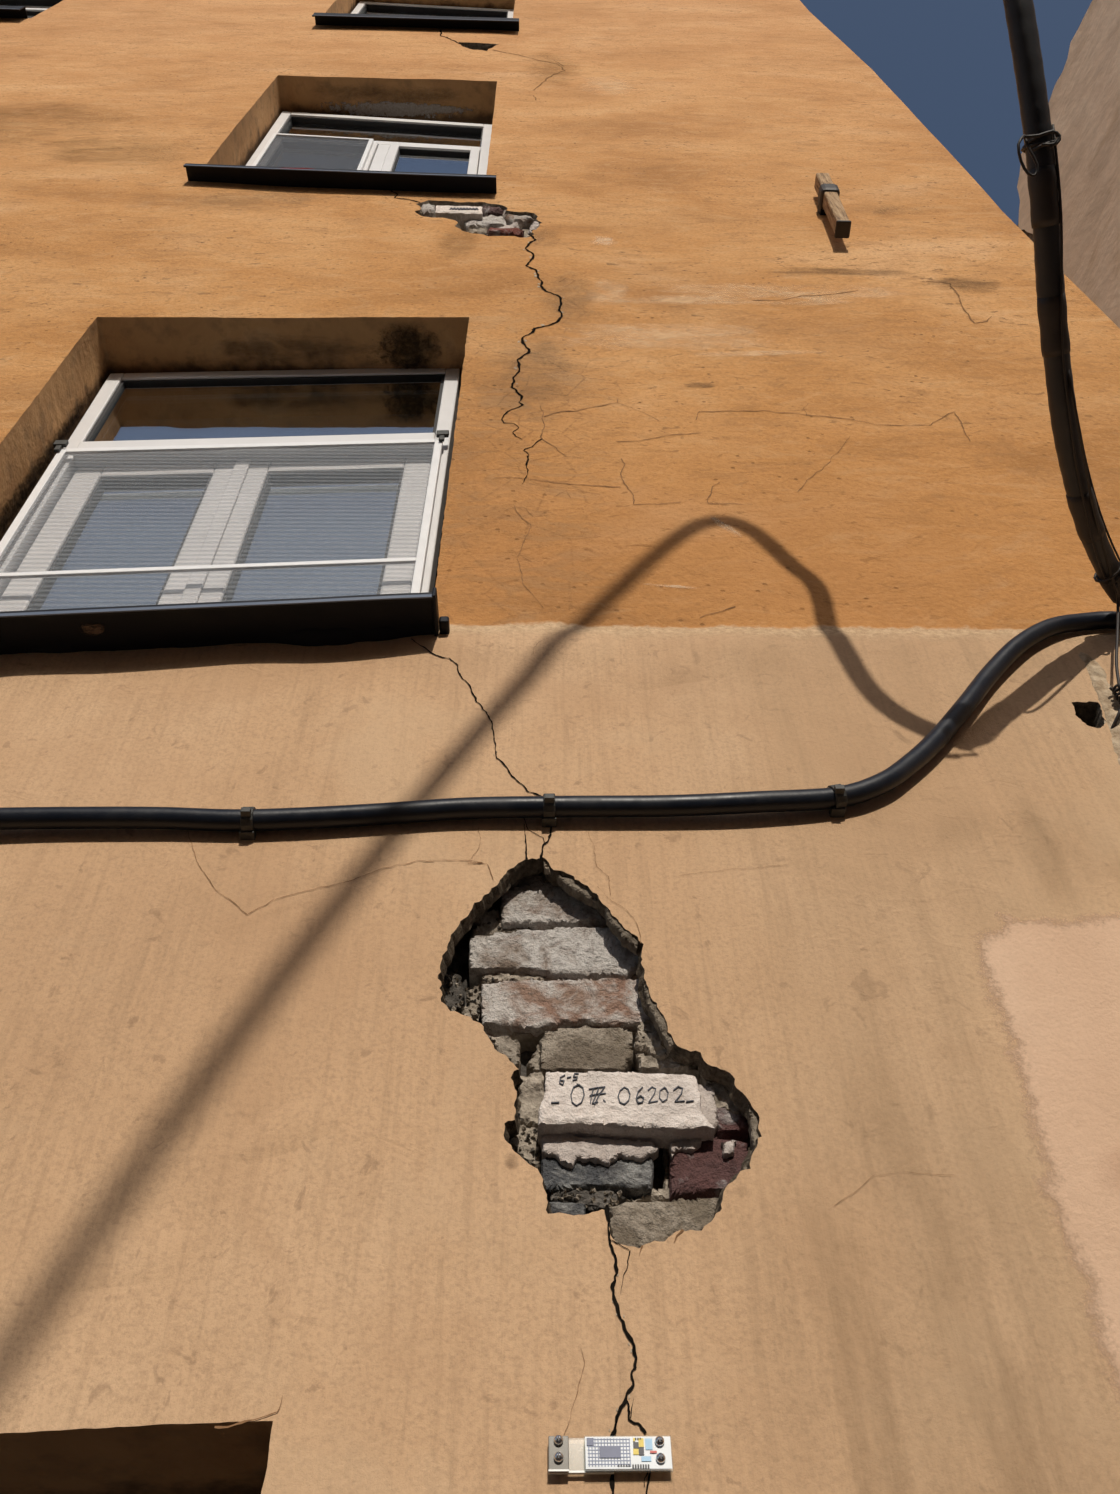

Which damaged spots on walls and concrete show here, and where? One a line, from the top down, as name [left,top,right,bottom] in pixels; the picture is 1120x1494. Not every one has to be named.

spalling [415,200,542,238]
crack [494,234,971,651]
crack [926,281,992,323]
spalling [1071,701,1106,728]
spalling [438,855,762,1248]
crack [604,1207,684,1494]